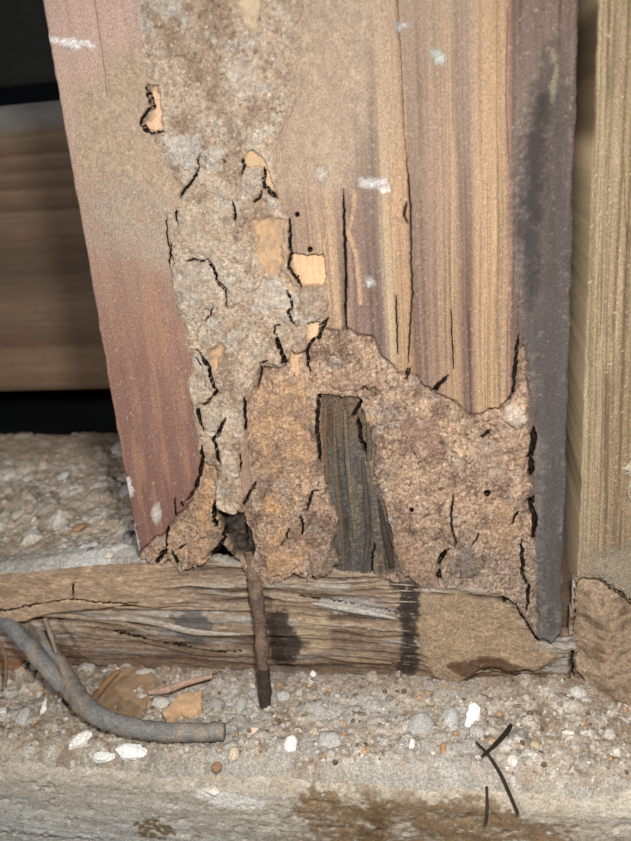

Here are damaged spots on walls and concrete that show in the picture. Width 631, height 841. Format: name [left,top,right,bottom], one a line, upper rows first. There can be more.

crack [223,159,278,220]
crack [395,0,414,379]
crack [165,157,227,321]
crack [155,189,348,565]
crack [433,313,454,391]
crack [507,336,519,400]
crack [352,386,369,452]
crack [526,425,537,475]
crack [436,495,479,581]
crack [512,495,538,611]
crack [0,831,93,841]
leakage [190,788,266,810]